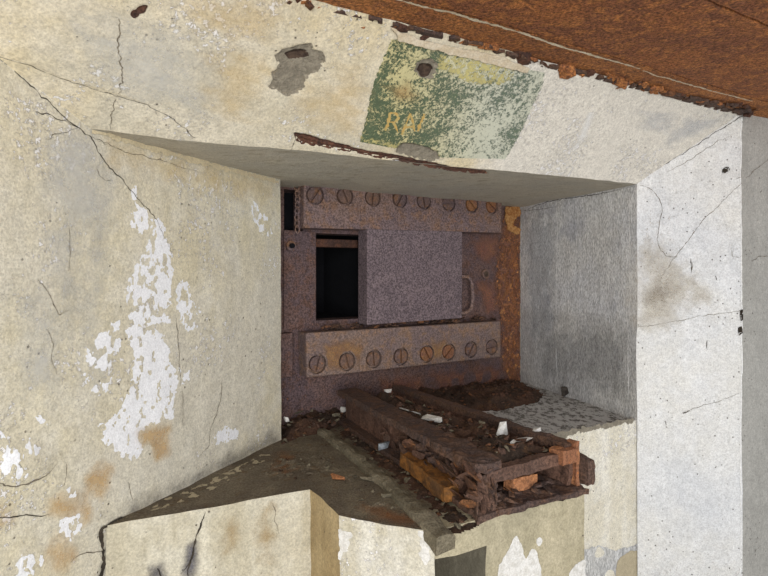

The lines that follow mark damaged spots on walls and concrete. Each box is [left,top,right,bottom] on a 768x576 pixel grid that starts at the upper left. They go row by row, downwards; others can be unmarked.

corrosion [287,0,320,11]
spalling [268,43,326,96]
spalling [392,28,530,79]
corrosion [333,10,757,118]
crack [0,20,197,254]
crack [666,116,743,172]
crack [524,161,767,272]
peeling [83,185,201,461]
corrosion [321,206,521,381]
peeling [0,431,41,479]
crack [184,512,206,575]
peeling [498,536,542,576]